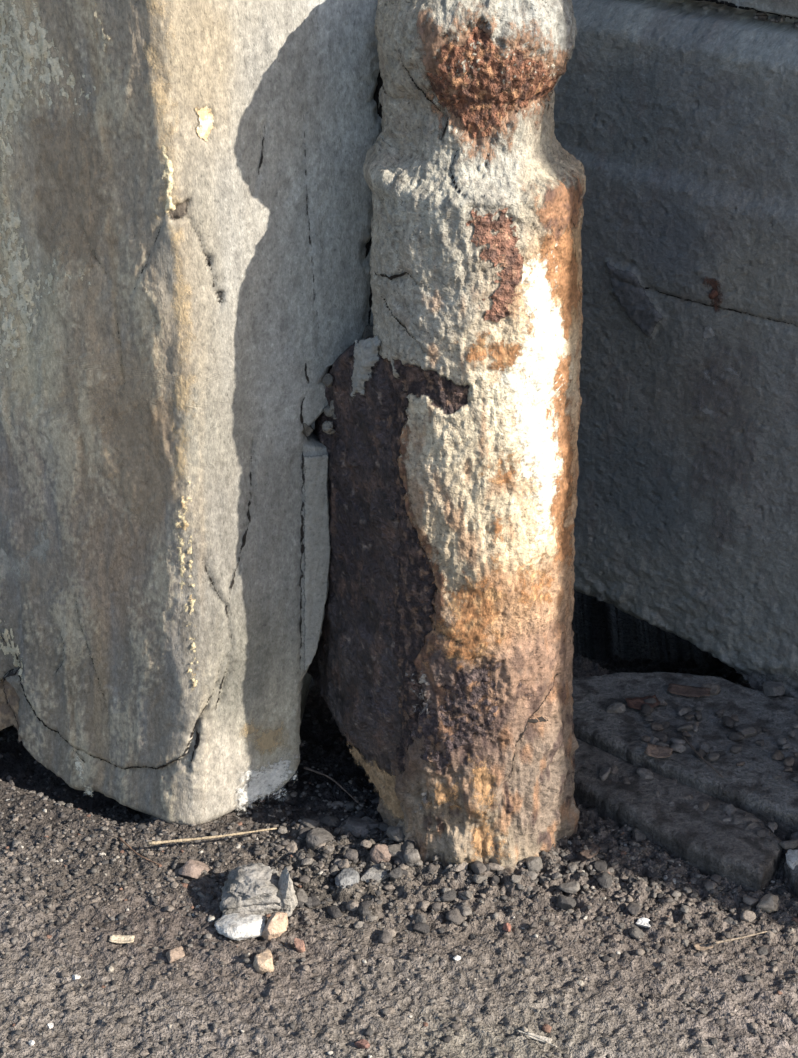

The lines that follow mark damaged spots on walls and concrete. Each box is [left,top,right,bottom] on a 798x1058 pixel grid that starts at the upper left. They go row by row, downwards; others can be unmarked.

spalling [195,106,215,142]
crack [257,125,265,173]
rust [416,2,569,164]
rust [466,206,532,372]
rust [535,173,584,340]
crack [205,456,252,638]
crack [299,363,309,659]
spalling [351,335,503,772]
rust [397,354,574,669]
crack [1,636,226,770]
rust [348,743,404,819]
rust [468,758,510,864]